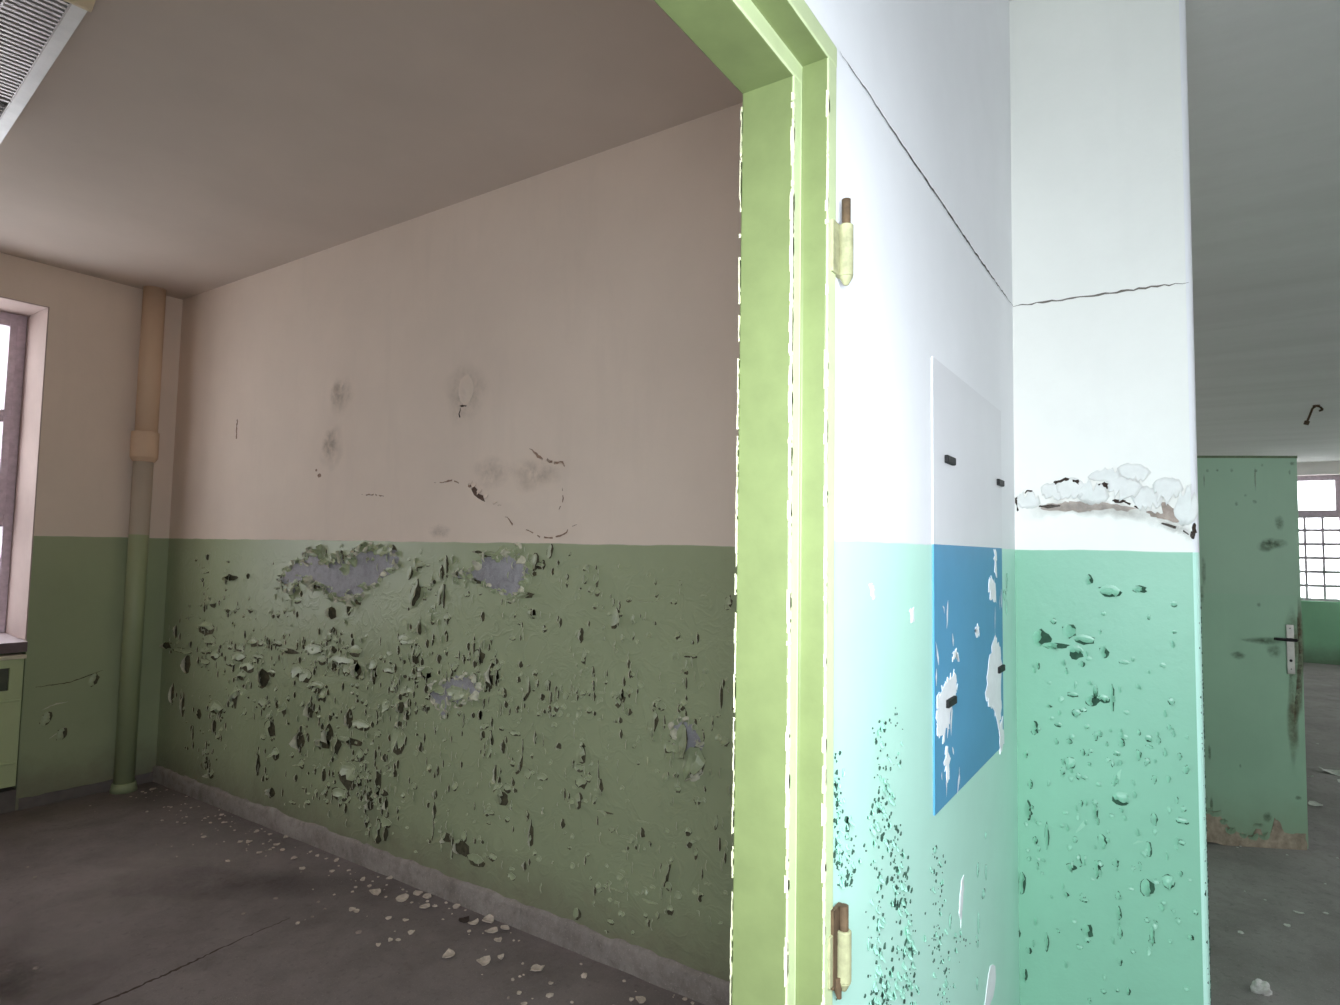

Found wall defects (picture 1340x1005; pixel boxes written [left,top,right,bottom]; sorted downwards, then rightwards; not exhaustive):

crack [840,52,1189,307]
spalling [160,540,734,935]
peeling [833,707,987,1005]
spalling [976,964,996,1005]
peeling [1018,574,1270,998]